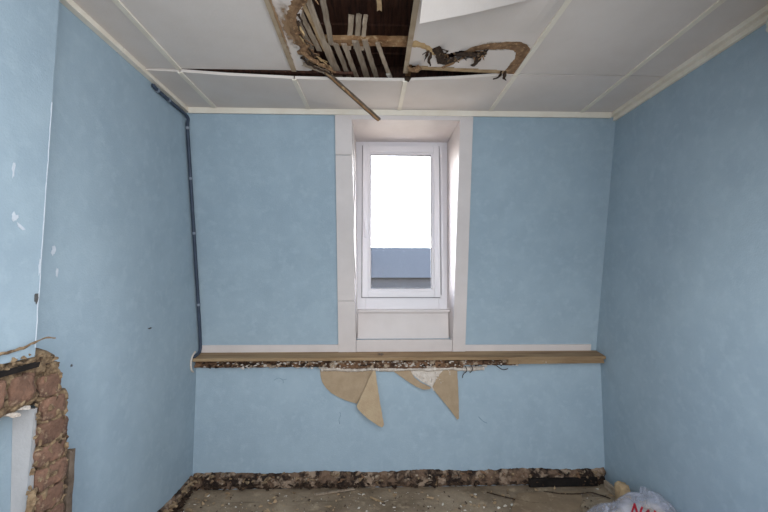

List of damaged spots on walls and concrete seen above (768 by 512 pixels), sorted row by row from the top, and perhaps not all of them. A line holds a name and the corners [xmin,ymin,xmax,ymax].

peeling [296,13,333,75]
peeling [422,46,489,67]
spalling [190,351,604,378]
flaking render [0,337,69,512]